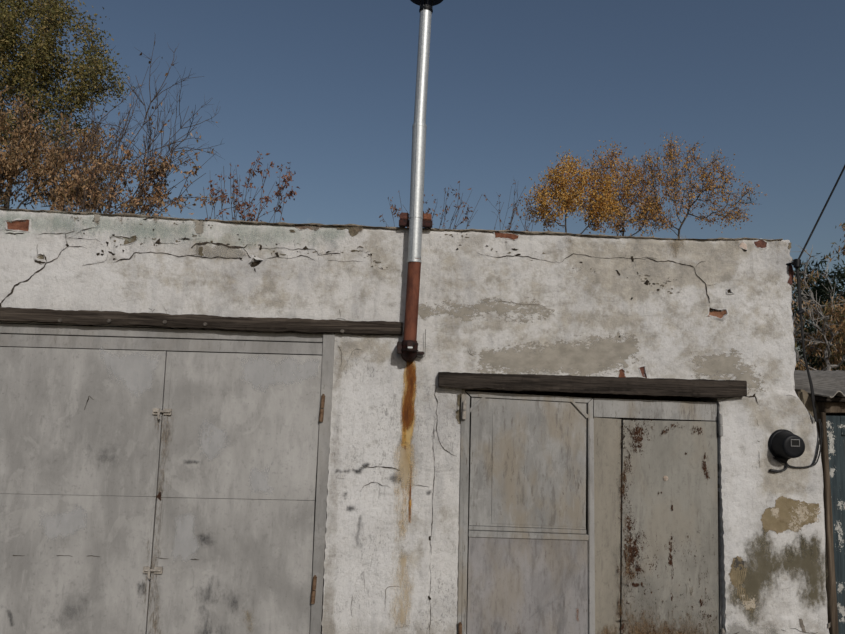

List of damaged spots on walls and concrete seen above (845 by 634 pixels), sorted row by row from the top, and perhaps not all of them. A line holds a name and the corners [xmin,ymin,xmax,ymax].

flaking render [4,218,32,235]
crack [0,227,385,307]
crack [481,248,710,303]
flaking render [706,307,729,322]
corrosion [399,361,416,527]
crack [420,385,457,546]
peeling [826,421,845,477]
corrosion [602,418,719,634]
flaking render [760,496,821,534]
flaking render [728,556,758,611]